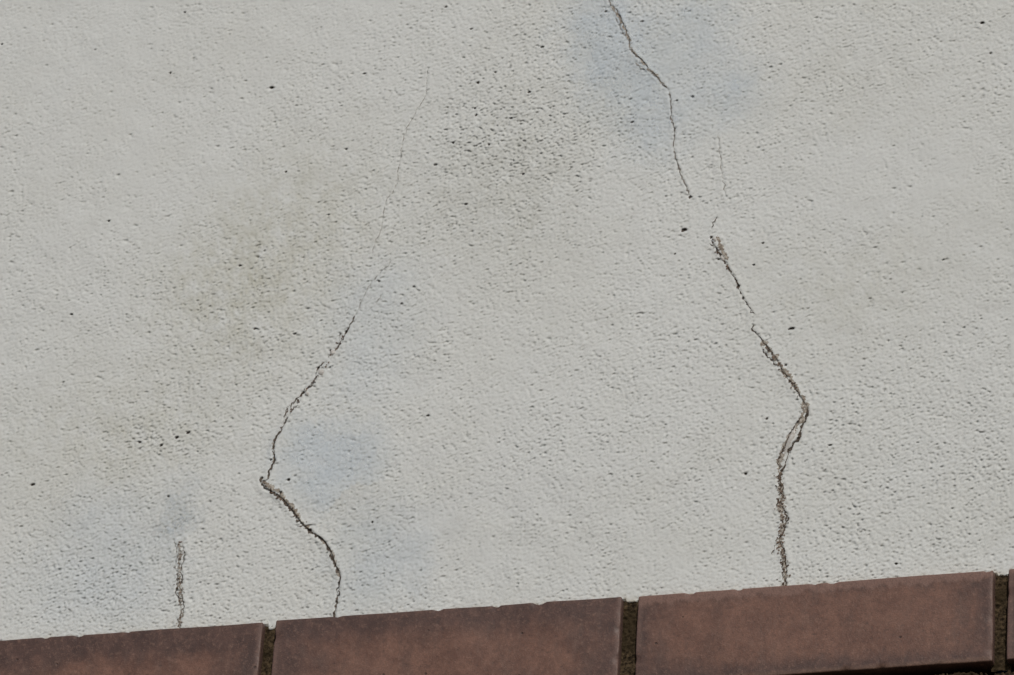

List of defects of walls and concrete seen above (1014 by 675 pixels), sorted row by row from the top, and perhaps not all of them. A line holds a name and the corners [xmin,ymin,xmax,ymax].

crack [609,1,691,199]
crack [174,541,185,628]
crack [259,71,428,617]
crack [710,217,810,586]